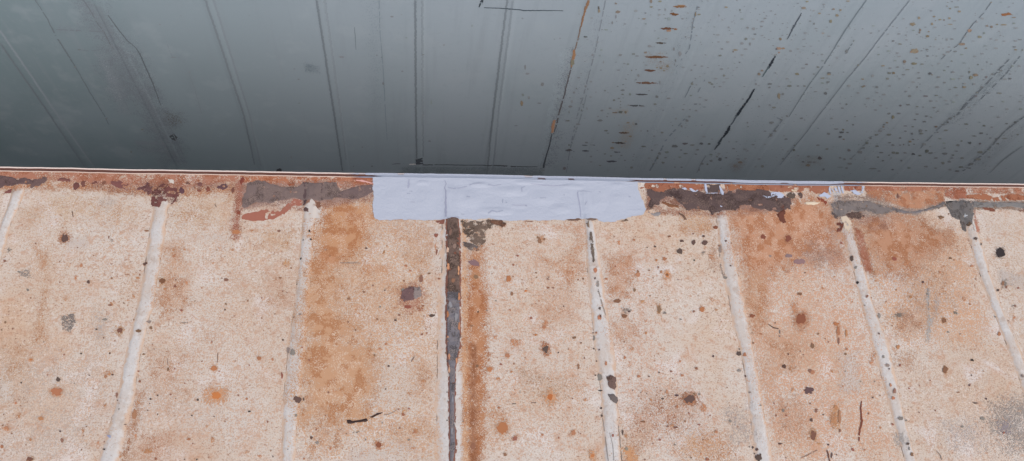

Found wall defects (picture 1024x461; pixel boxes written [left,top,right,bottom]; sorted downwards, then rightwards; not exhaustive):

rust [543,0,600,168]
crack [714,13,802,150]
peeling [0,176,373,215]
peeling [647,184,1024,254]
peeling [429,217,506,461]
rust [0,171,1024,461]